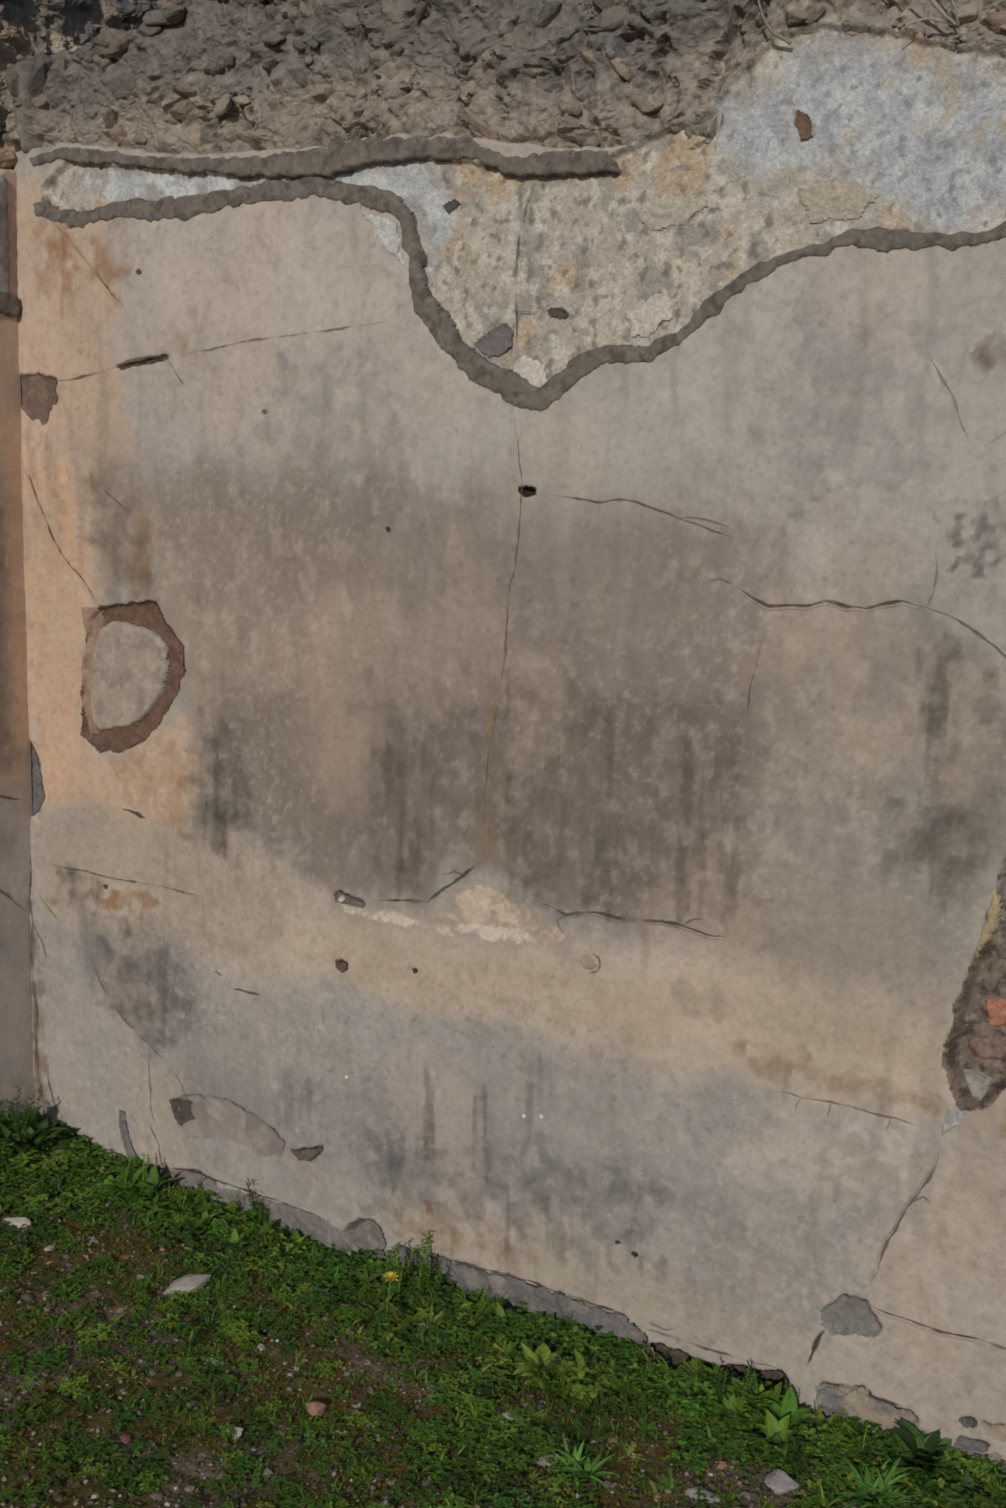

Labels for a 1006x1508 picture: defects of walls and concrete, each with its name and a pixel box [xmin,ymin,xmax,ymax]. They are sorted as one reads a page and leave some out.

flaking render [40,160,299,212]
flaking render [323,19,1006,388]
crack [572,497,736,539]
crack [715,578,1006,658]
spalling [80,600,186,753]
crack [540,903,718,939]
crack [0,854,135,1112]
spalling [941,858,1006,1136]
crack [878,1171,933,1262]
flaking render [373,1245,668,1365]
crack [872,1306,1003,1348]
flaking render [810,1382,1006,1474]